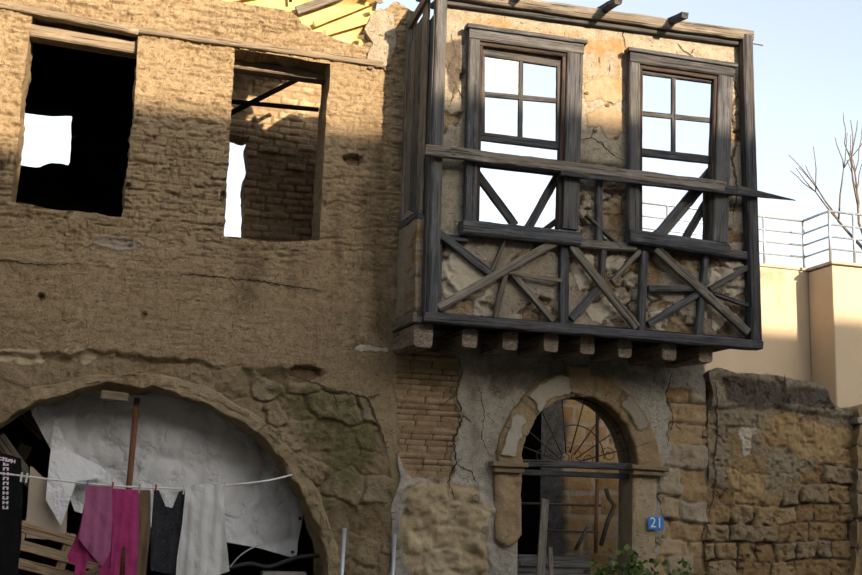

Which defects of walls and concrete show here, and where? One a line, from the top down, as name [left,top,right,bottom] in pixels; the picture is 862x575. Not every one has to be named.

crack [581,128,625,161]
flaking render [354,337,465,480]
crack [444,354,494,499]
flaking render [726,427,764,514]